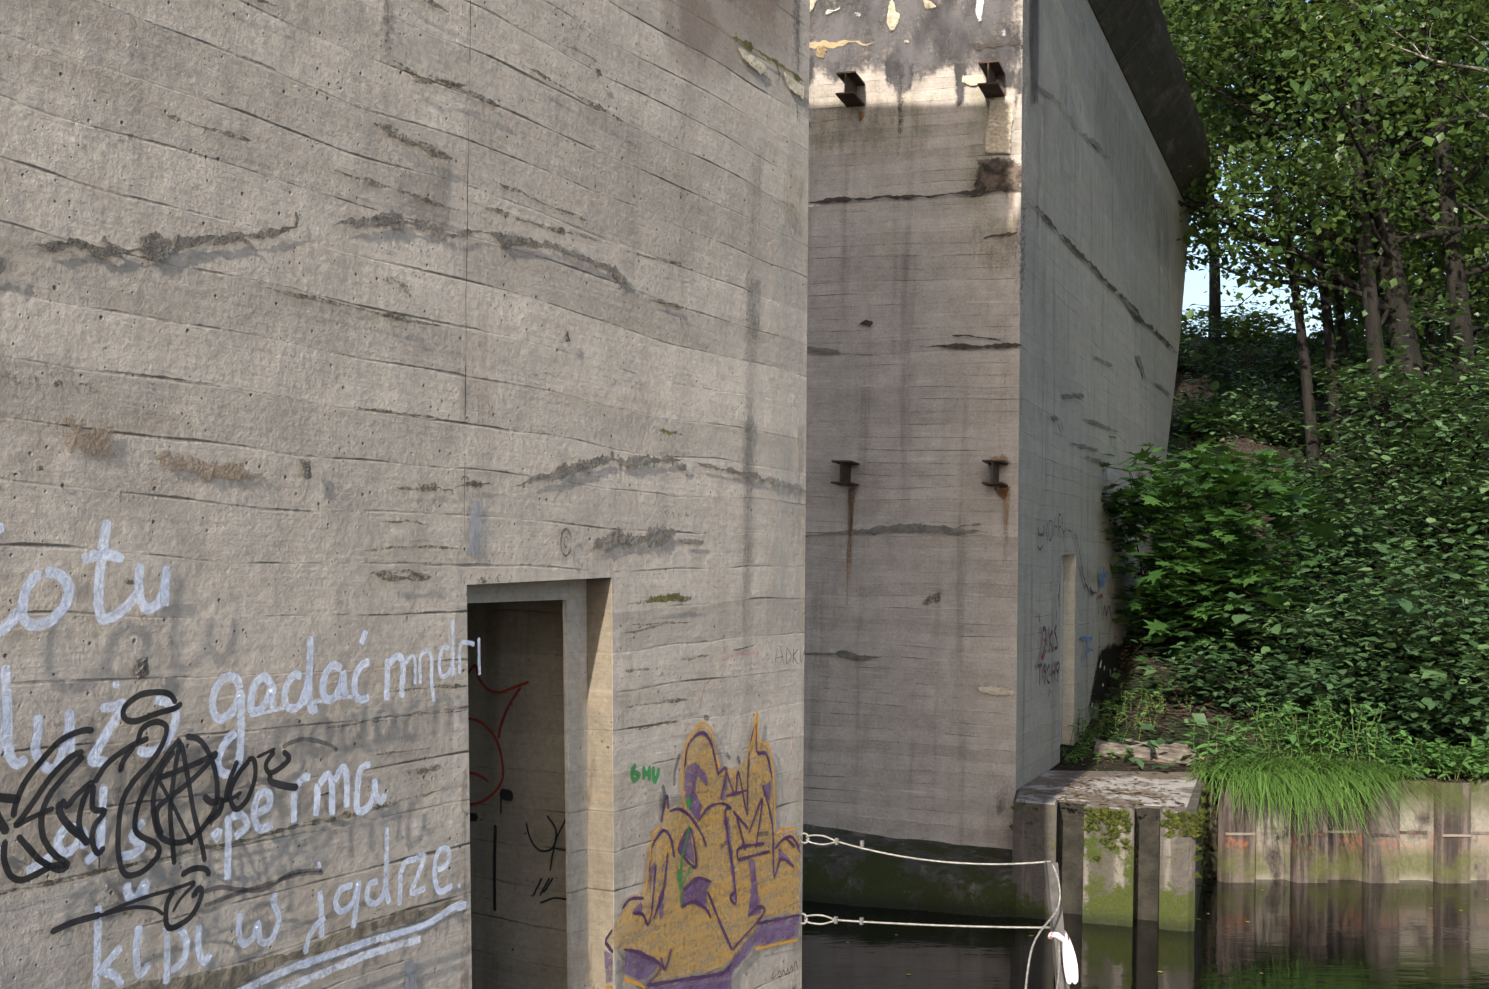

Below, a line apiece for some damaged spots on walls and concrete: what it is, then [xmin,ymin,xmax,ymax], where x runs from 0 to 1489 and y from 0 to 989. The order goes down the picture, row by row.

water stain [881,60,913,133]
water stain [954,62,968,106]
water stain [996,0,1040,111]
crack [807,189,1177,356]
rust [847,488,855,591]
rust [995,487,1010,525]